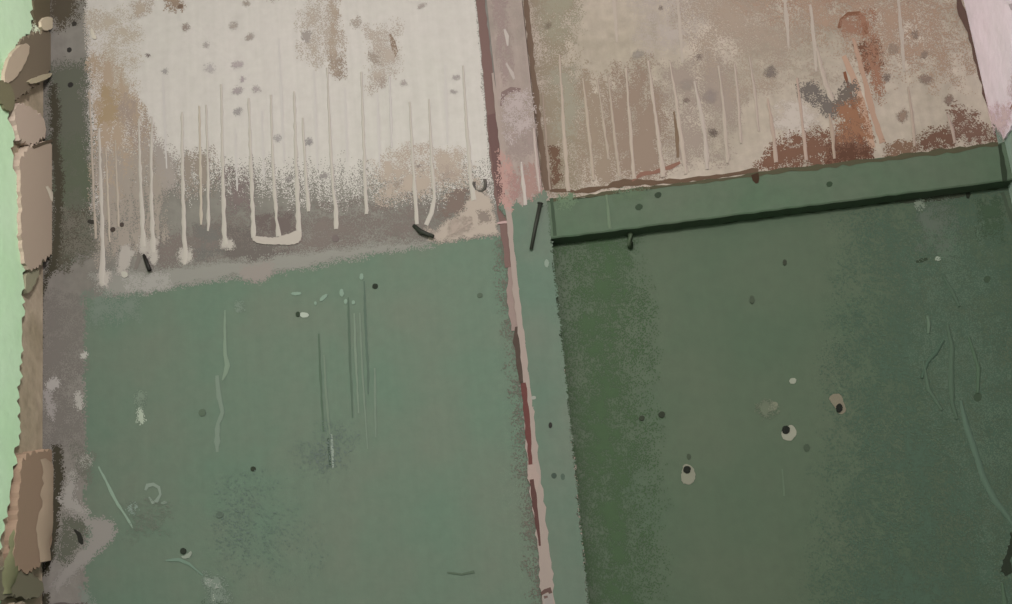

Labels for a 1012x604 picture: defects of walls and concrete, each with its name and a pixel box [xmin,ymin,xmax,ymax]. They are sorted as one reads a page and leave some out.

water stain [43,3,220,274]
water stain [230,60,262,95]
water stain [494,0,749,213]
water stain [795,79,861,119]
water stain [133,181,474,273]
spalling [475,209,492,224]
spalling [0,449,52,604]